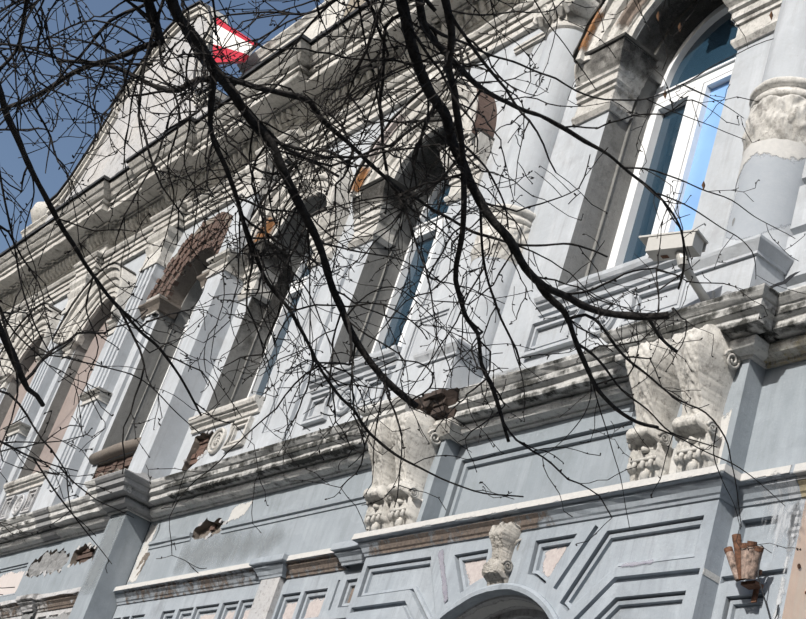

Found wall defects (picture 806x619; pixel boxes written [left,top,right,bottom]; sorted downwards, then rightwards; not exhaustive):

peeling [735,137,806,189]
leakage [608,286,806,369]
leakage [495,344,626,405]
leakage [164,417,368,499]
flaking render [67,542,97,568]
peeling [114,524,251,591]
peeling [198,502,252,540]
peeling [287,548,334,561]
peeling [351,464,791,542]
corrosion [724,534,764,553]